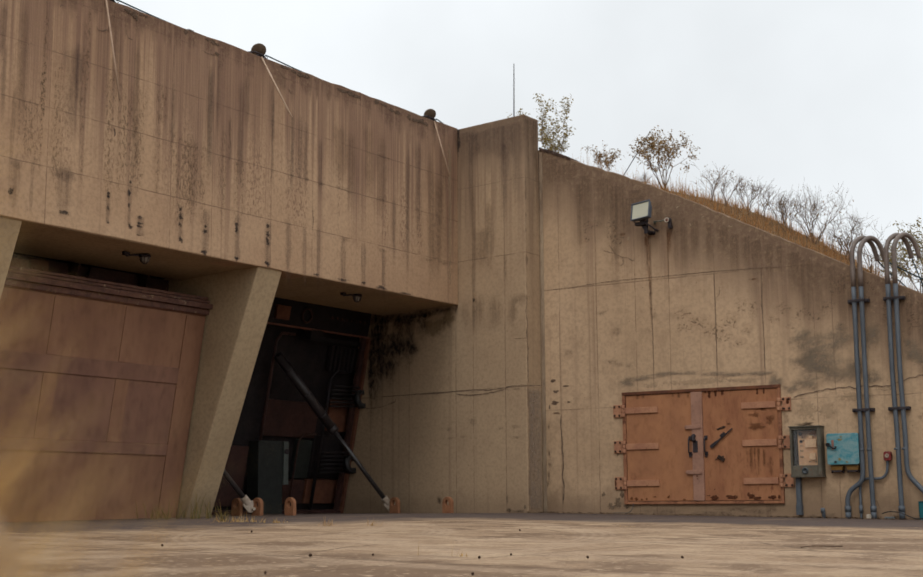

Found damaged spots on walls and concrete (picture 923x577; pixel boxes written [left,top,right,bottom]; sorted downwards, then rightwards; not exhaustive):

crack [795,375,918,397]
corrosion [707,489,781,500]